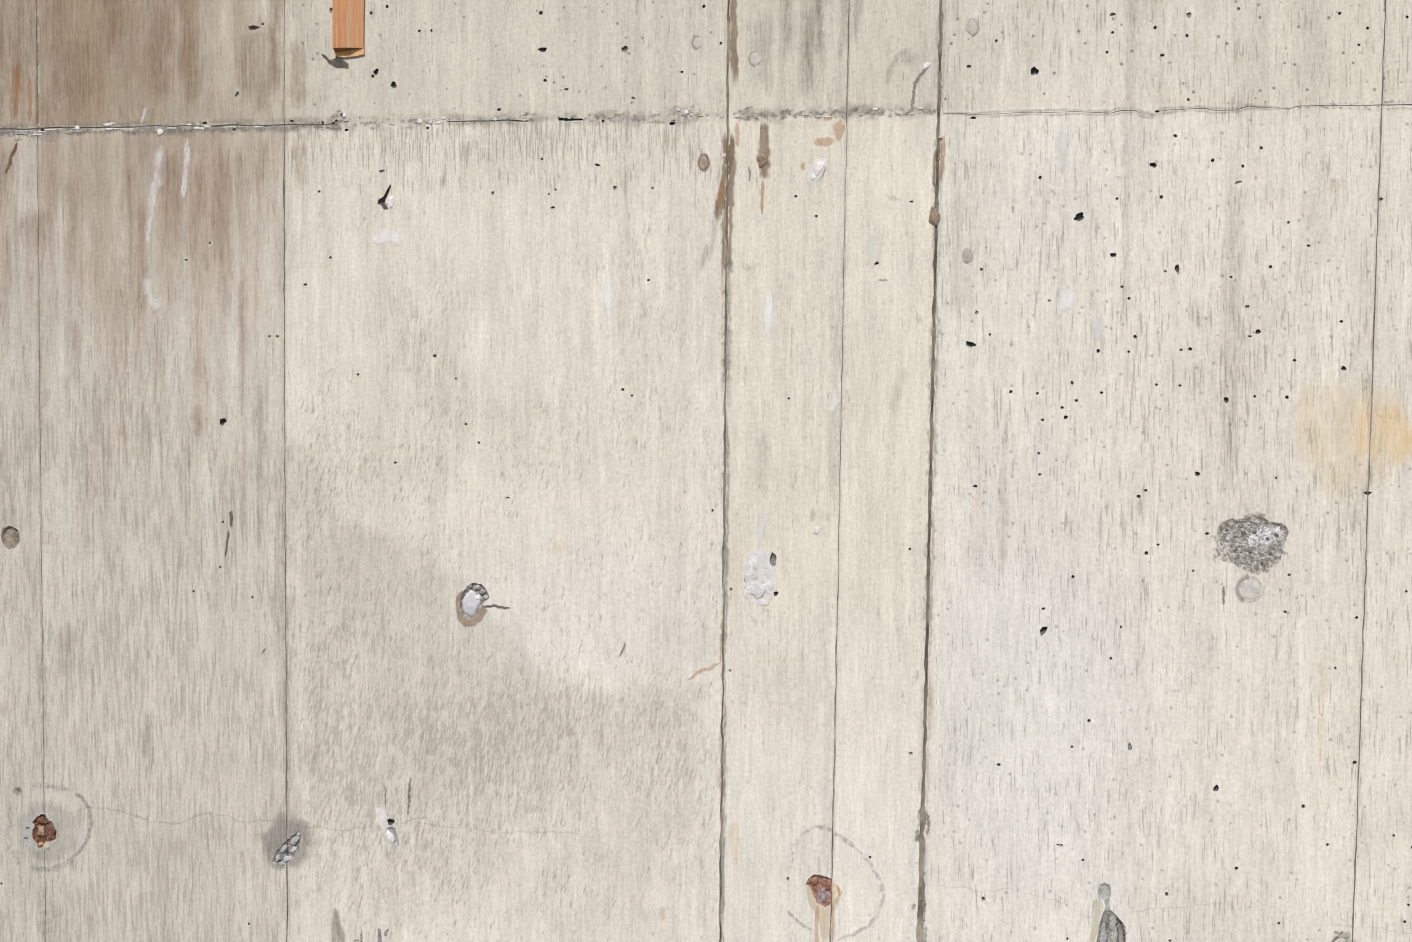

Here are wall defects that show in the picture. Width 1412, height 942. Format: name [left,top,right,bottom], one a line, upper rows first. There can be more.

corrosion [756,124,770,188]
corrosion [716,138,738,267]
spalling [1225,528,1279,565]
spalling [1093,882,1126,942]